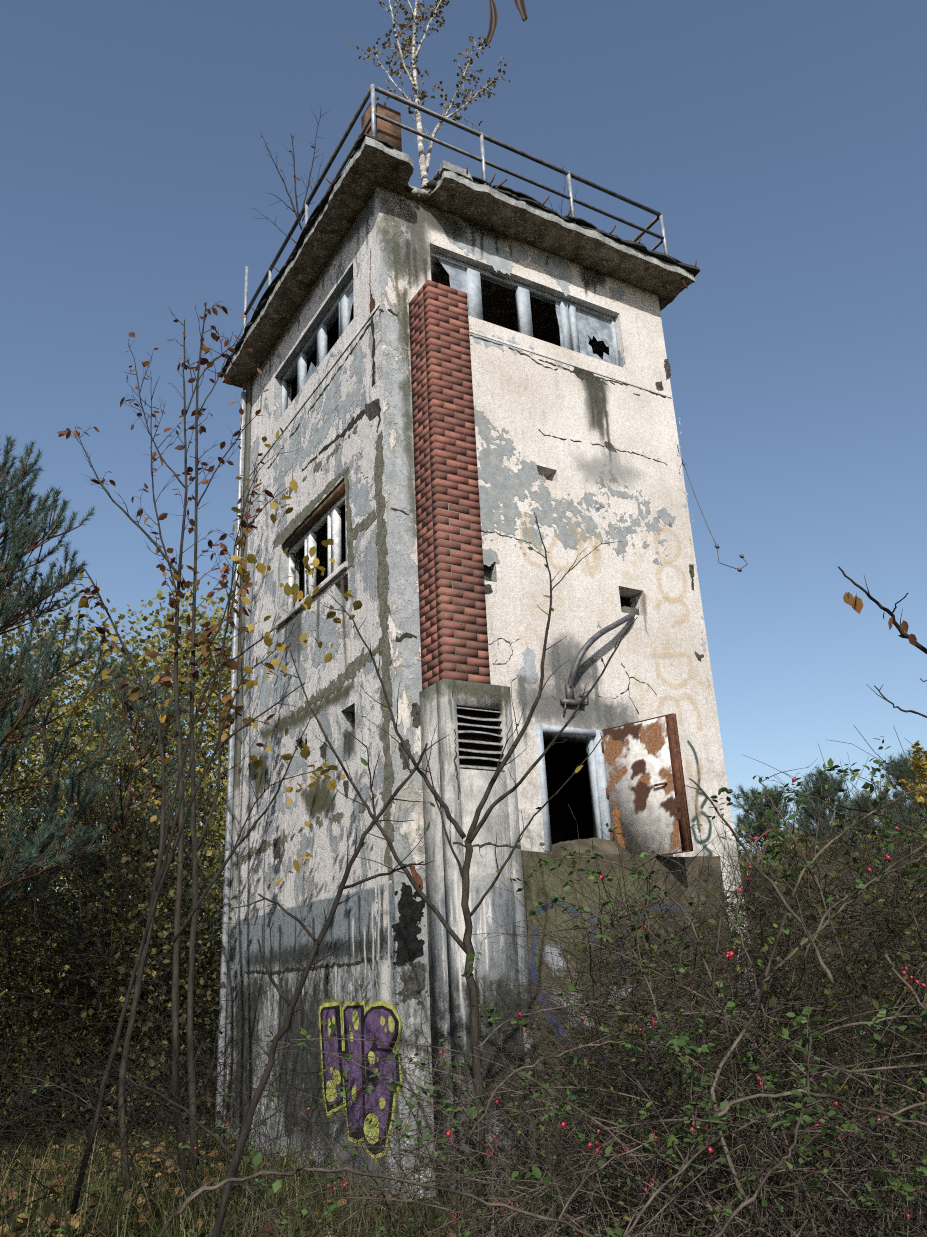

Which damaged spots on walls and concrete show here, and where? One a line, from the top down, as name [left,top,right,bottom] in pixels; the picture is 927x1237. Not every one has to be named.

crack [470,334,666,398]
peeling [474,406,693,566]
water stain [582,375,610,449]
crack [539,429,687,474]
peeling [241,304,419,859]
spalling [398,702,421,771]
corrosion [602,718,684,852]
water stain [246,867,391,1030]
spalling [374,865,429,1006]
water stain [454,869,488,1034]